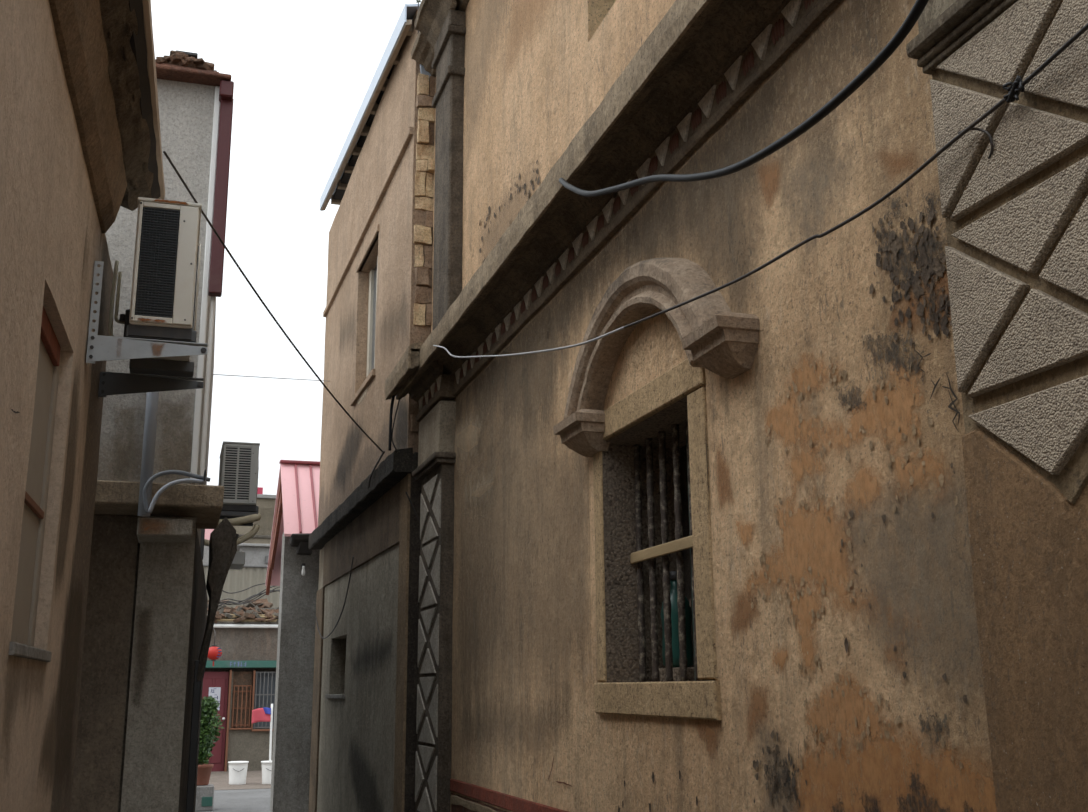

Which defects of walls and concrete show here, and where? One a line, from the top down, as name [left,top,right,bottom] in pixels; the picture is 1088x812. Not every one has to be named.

leakage [861,187,952,382]
flaking render [792,638,997,812]